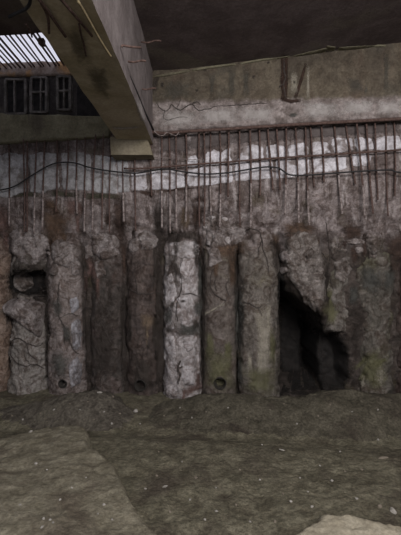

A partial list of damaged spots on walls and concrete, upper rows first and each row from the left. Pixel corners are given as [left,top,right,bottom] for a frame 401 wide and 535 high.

rust [280,56,306,103]
leakage [159,122,398,152]
flaking render [0,121,401,388]
crack [245,228,269,272]
crack [174,259,199,322]
crack [10,338,43,368]
crack [176,360,184,384]